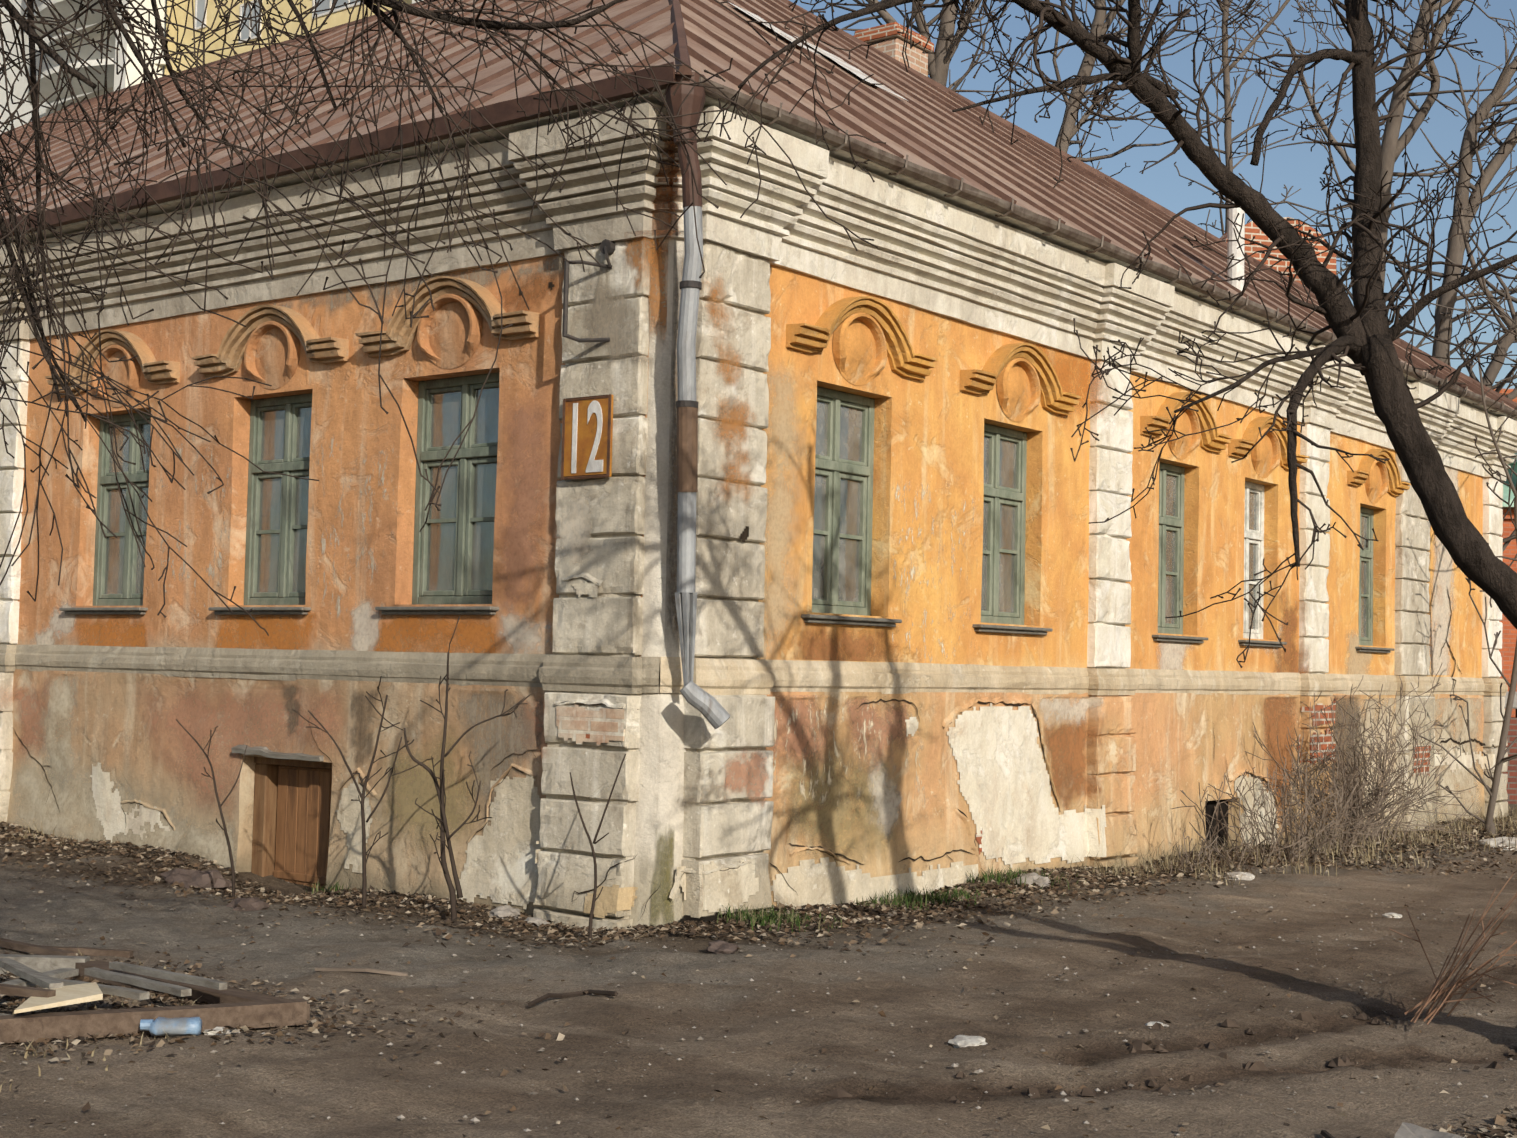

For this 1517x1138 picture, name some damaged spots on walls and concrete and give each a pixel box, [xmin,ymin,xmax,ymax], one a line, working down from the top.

peeling [16,675,233,869]
spalling [336,767,377,876]
spalling [456,763,545,910]
flaking render [519,699,641,746]
damp [791,752,901,849]
spalling [669,695,1106,913]
spalling [1229,767,1279,846]
peeling [1297,698,1496,825]